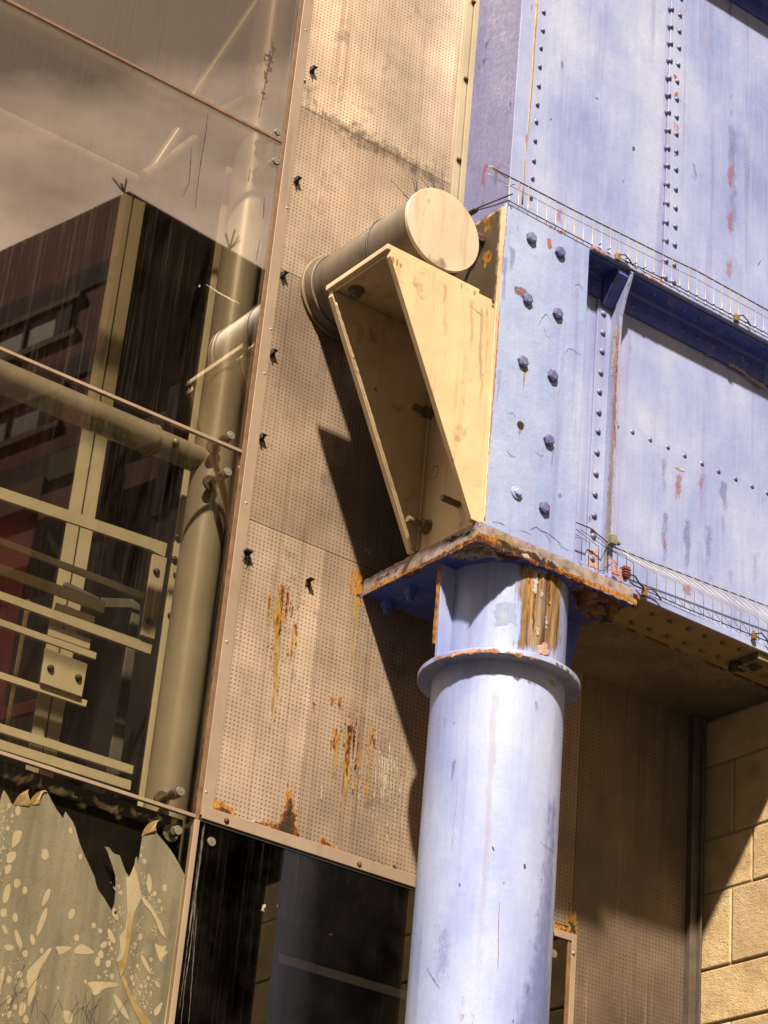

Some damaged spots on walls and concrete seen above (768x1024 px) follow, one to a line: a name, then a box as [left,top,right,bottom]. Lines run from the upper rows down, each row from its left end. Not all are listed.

corrosion [489,300,500,452]
corrosion [267,578,299,724]
corrosion [349,519,640,674]
corrosion [213,798,234,816]
corrosion [251,783,300,837]
corrosion [330,695,376,816]